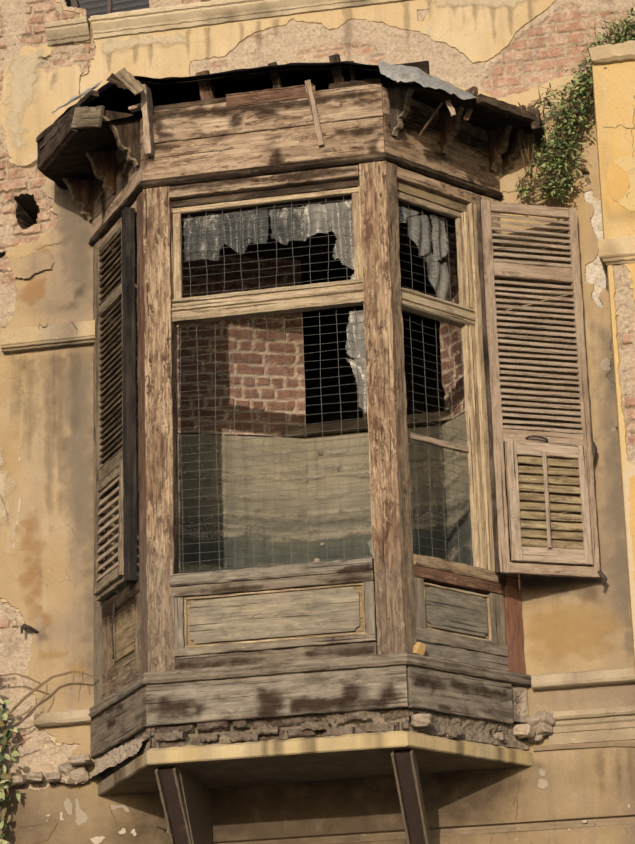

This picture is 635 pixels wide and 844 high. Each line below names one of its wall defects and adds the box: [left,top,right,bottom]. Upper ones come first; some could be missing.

flaking render [0,0,96,105]
leakage [102,34,187,53]
flaking render [190,0,635,99]
flaking render [0,123,58,328]
flaking render [582,169,603,240]
flaking render [585,253,635,464]
spalling [0,599,555,790]
flaking render [60,798,88,826]